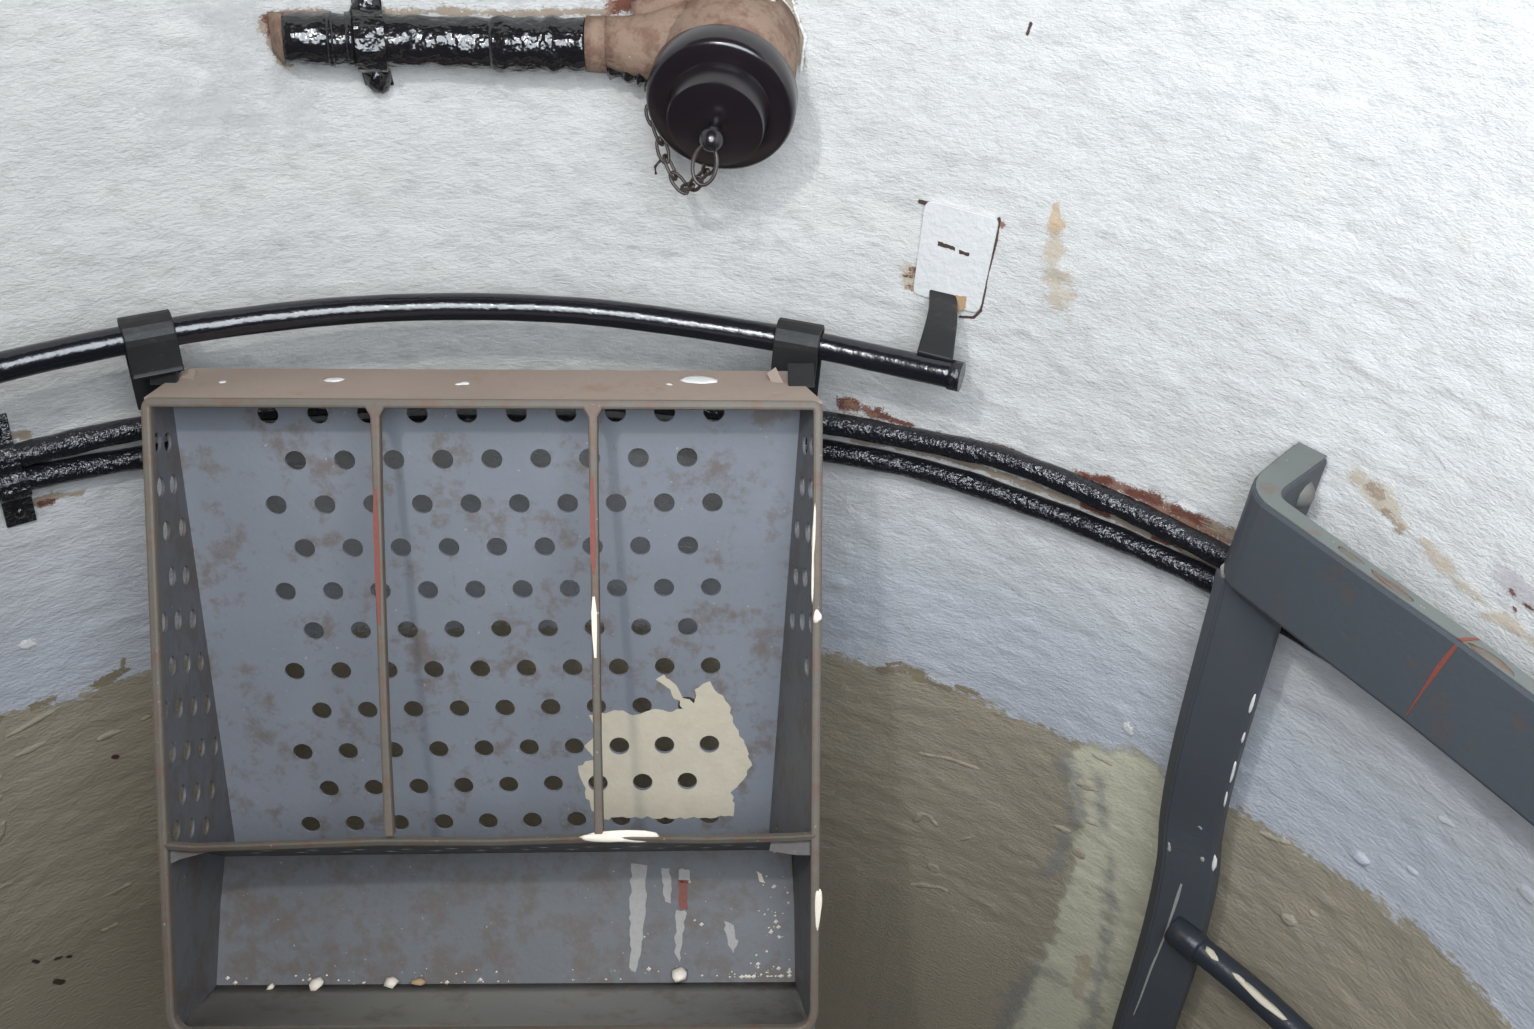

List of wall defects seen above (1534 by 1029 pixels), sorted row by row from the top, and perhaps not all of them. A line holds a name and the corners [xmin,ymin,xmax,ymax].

rust [1048,203,1065,234]
rust [1075,468,1236,545]